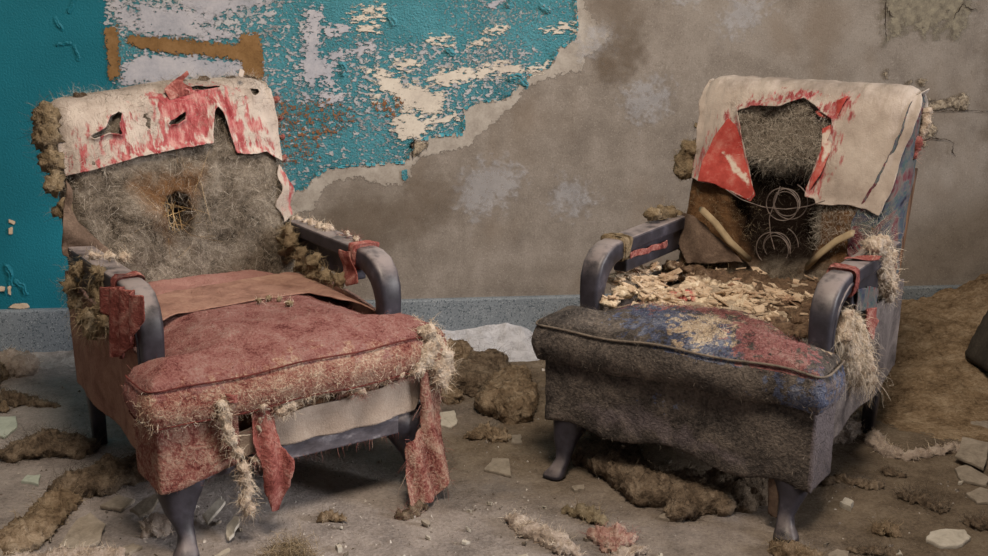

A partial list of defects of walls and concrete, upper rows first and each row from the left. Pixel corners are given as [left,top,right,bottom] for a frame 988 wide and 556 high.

crack [884,2,893,42]
peeling [103,0,988,300]
peeling [0,286,29,309]